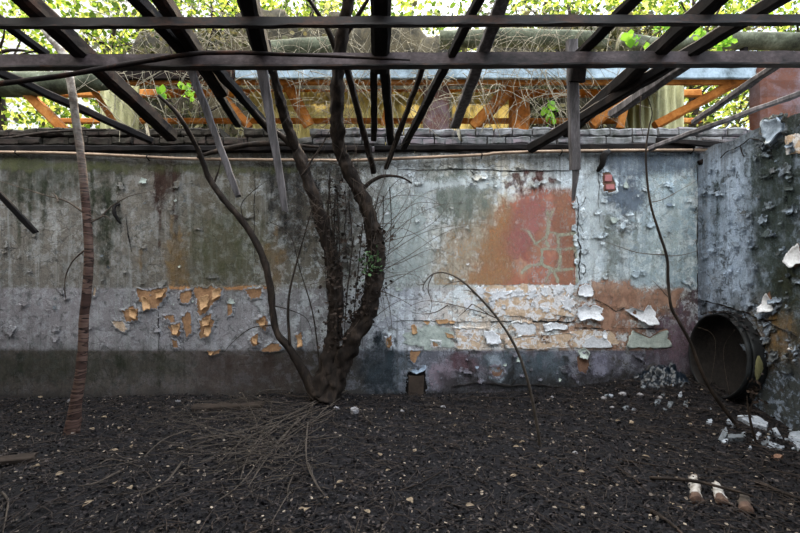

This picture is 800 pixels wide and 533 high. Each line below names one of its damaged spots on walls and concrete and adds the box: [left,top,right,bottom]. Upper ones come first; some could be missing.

damp [149,161,201,229]
rust [434,169,576,285]
crack [521,173,600,283]
peeling [591,168,655,245]
peeling [702,113,800,375]
spalling [110,272,267,352]
spalling [247,312,285,355]
damp [359,332,401,394]
damp [428,352,636,393]
spalling [384,264,694,394]